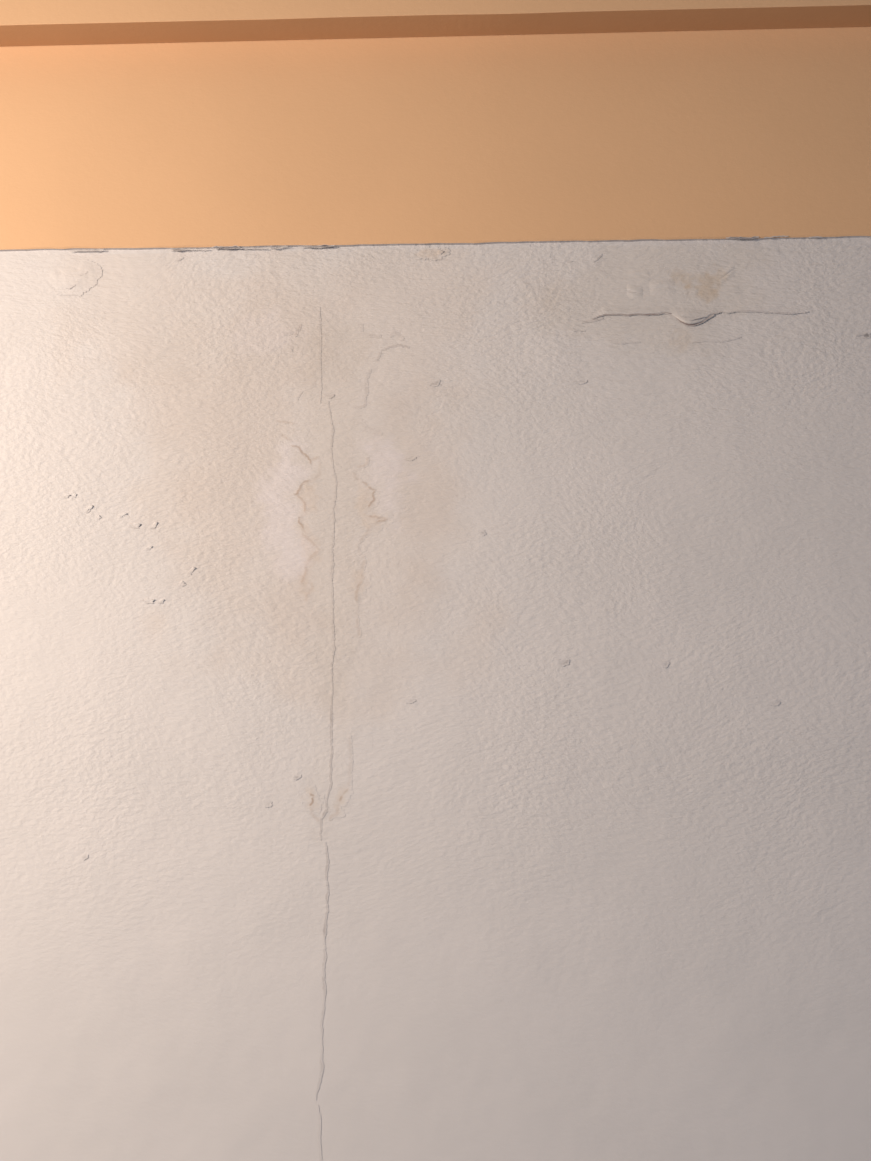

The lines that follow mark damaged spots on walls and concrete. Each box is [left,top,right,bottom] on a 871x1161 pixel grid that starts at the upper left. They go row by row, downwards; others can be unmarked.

crack [315,307,337,1161]
damp [33,243,796,850]
crack [567,305,672,345]